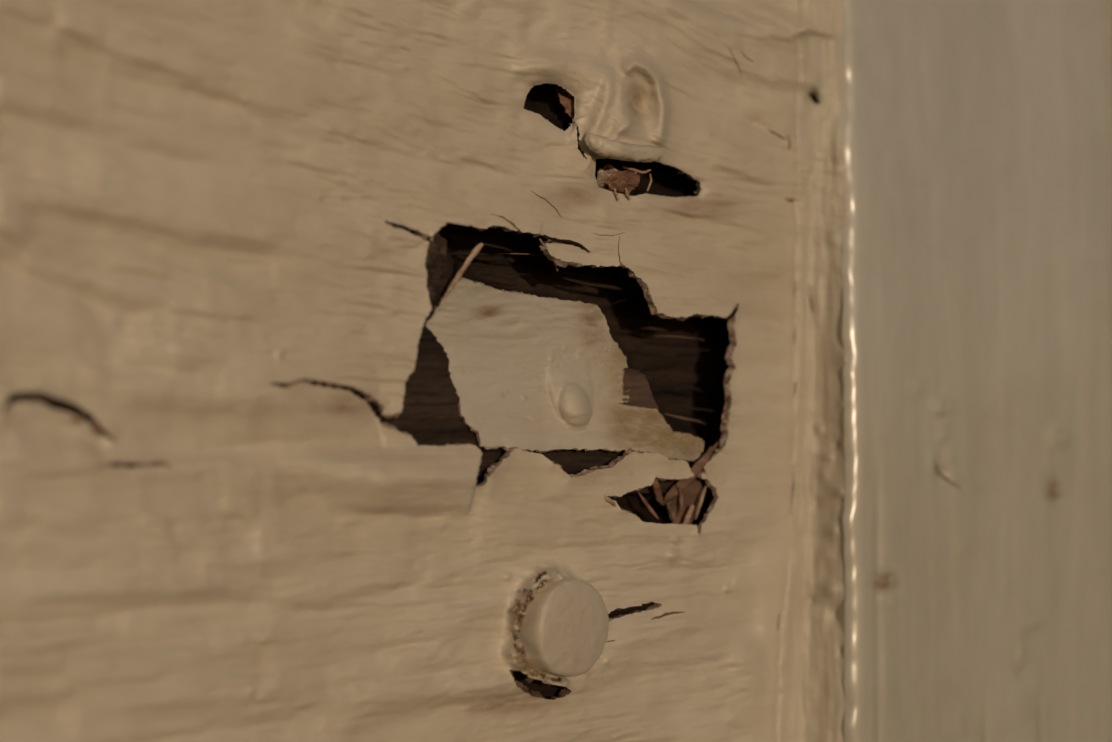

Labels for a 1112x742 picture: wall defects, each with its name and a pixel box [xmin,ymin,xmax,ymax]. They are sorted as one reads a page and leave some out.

spalling [523,83,579,141]
spalling [595,158,697,197]
crack [3,391,171,468]
crack [271,379,386,423]
peeling [378,220,739,528]
crack [607,602,684,642]